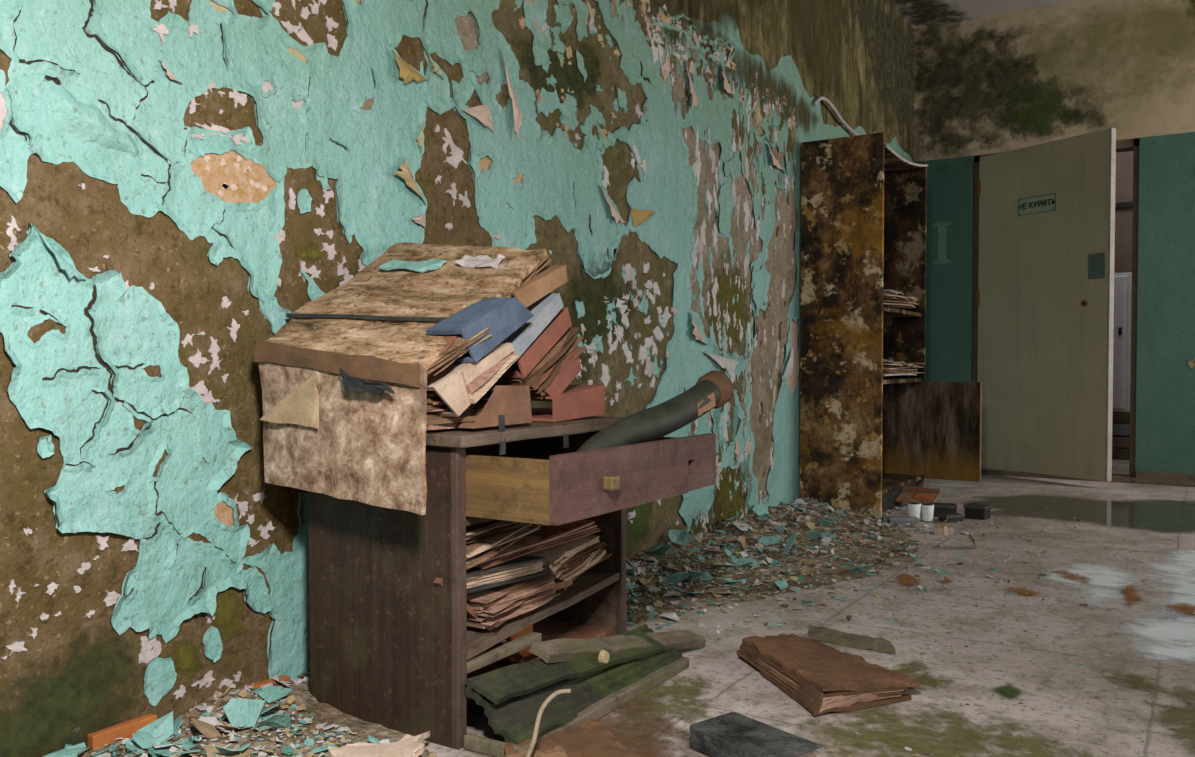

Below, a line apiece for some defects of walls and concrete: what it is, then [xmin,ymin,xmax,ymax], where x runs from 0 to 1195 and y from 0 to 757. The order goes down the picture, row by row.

crack [0,0,249,262]
peeling [172,74,311,157]
peeling [139,0,365,69]
leakage [636,0,817,131]
leakage [790,0,1054,158]
peeling [386,0,800,560]
crack [11,282,209,570]
peeling [0,140,376,738]
crack [125,588,138,605]
crack [188,545,237,606]
leakage [1047,564,1133,604]
leakage [1127,550,1195,662]